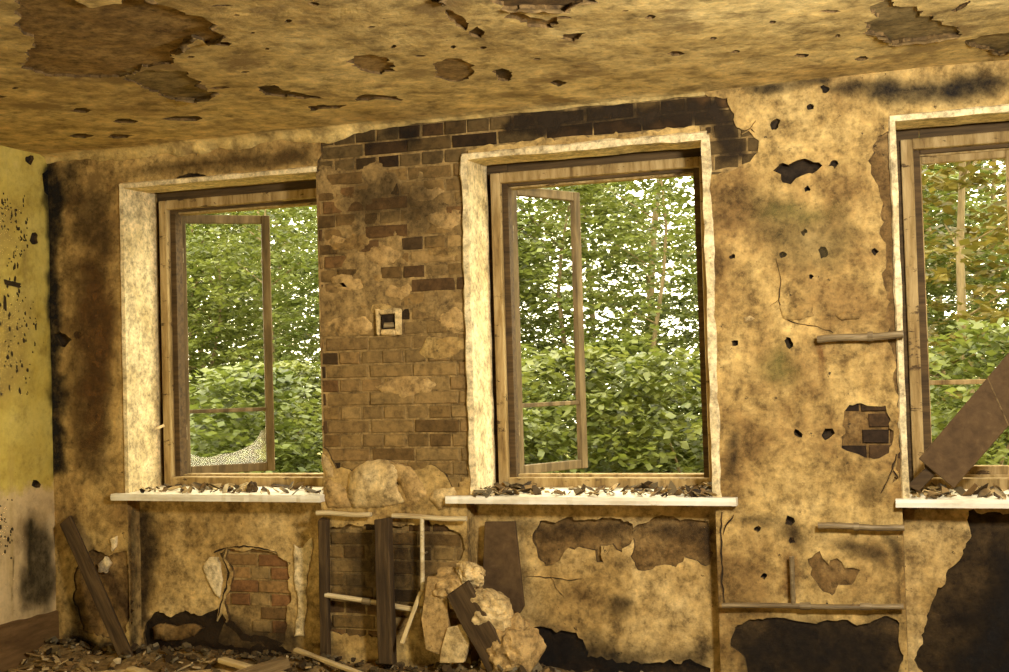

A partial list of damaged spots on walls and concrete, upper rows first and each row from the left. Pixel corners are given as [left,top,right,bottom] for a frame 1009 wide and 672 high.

peeling [15,0,229,104]
peeling [500,0,598,25]
peeling [866,0,1009,56]
hole [775,160,838,184]
water stain [42,163,107,472]
flaking render [317,95,759,487]
spalling [822,132,907,482]
water stain [21,521,55,604]
spalling [89,536,133,633]
flaking render [145,538,314,656]
spalling [534,515,713,570]
spalling [731,509,1009,672]